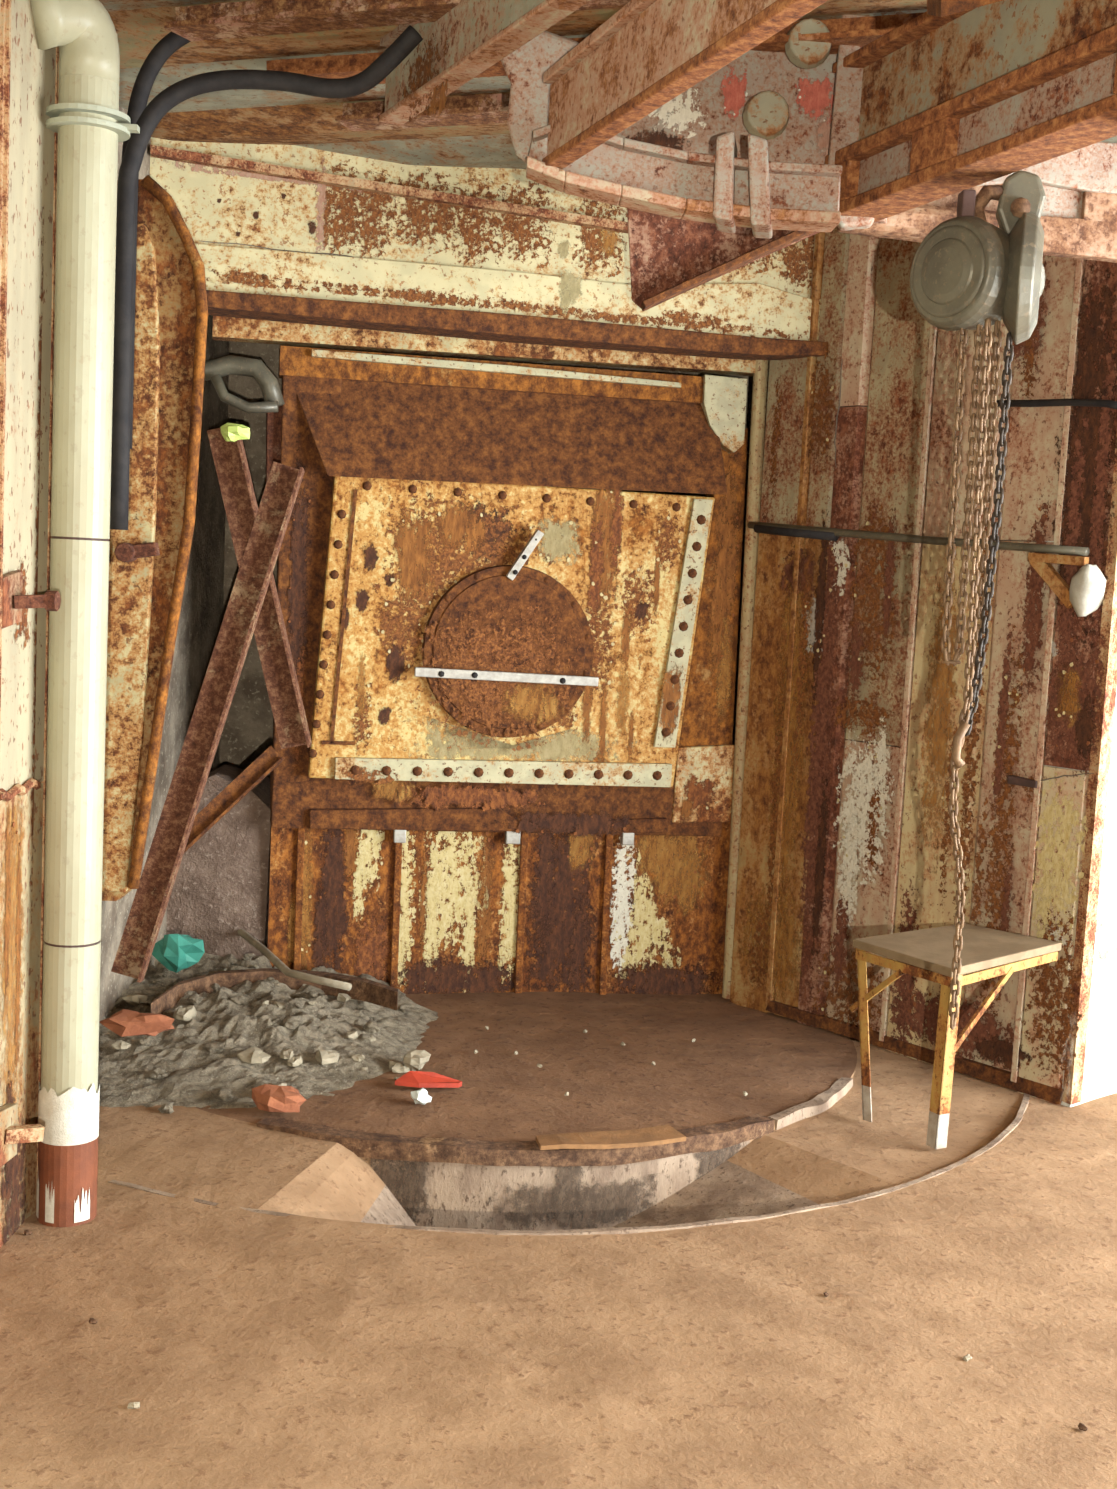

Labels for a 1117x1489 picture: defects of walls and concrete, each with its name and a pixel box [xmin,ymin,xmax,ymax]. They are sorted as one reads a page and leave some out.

corrosion [623,129,691,150]
corrosion [0,323,42,1124]
corrosion [287,441,311,704]
corrosion [175,159,838,471]
corrosion [311,481,719,995]
corrosion [767,380,783,498]
corrosion [739,483,940,1056]
corrosion [897,256,1117,932]
corrosion [955,899,1086,1091]
corrosion [1,1143,28,1244]